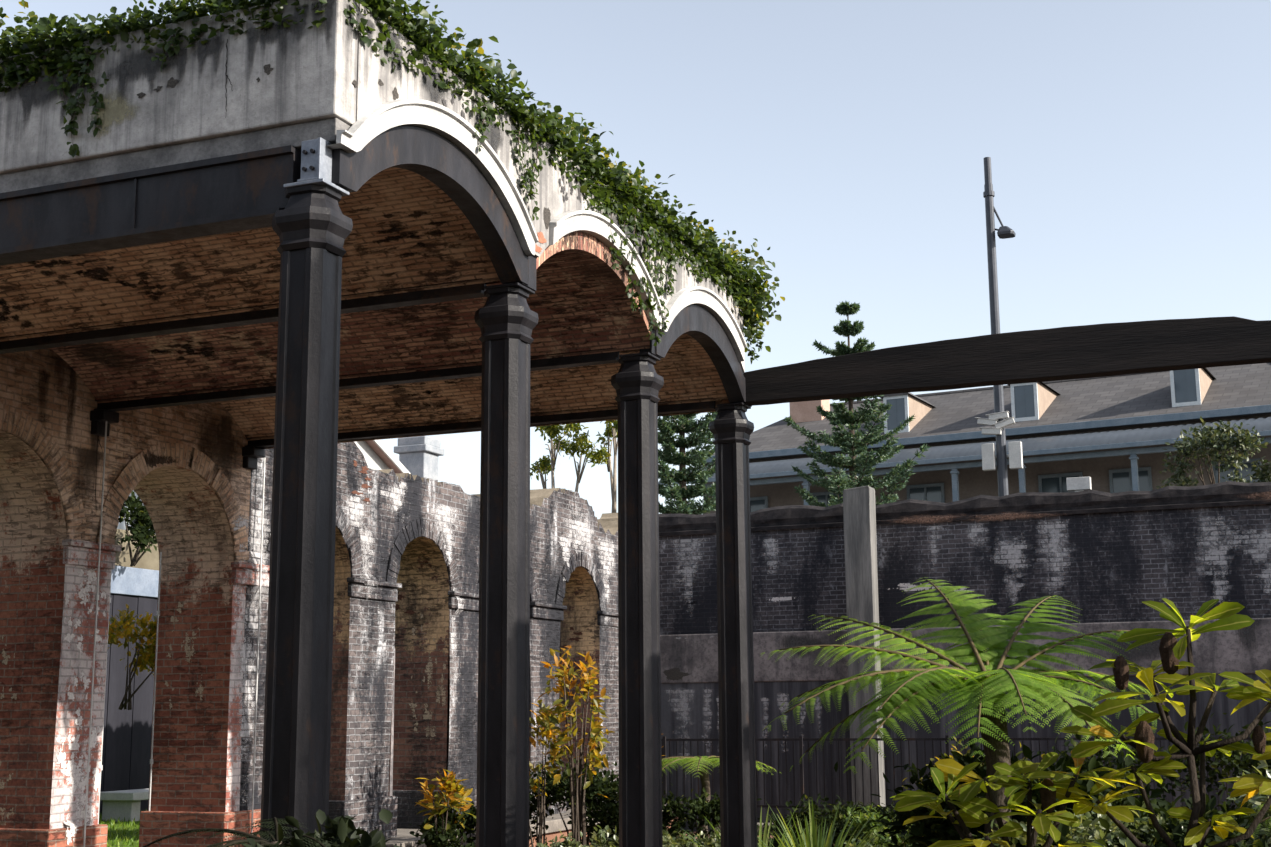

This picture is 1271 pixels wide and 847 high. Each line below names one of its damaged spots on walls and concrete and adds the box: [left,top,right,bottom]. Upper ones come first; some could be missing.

water stain [4,72,92,121]
water stain [108,32,224,94]
water stain [248,0,375,66]
water stain [388,33,403,79]
water stain [994,522,1068,601]
water stain [1198,517,1271,602]
peeling [64,567,107,655]
peeling [55,670,102,845]